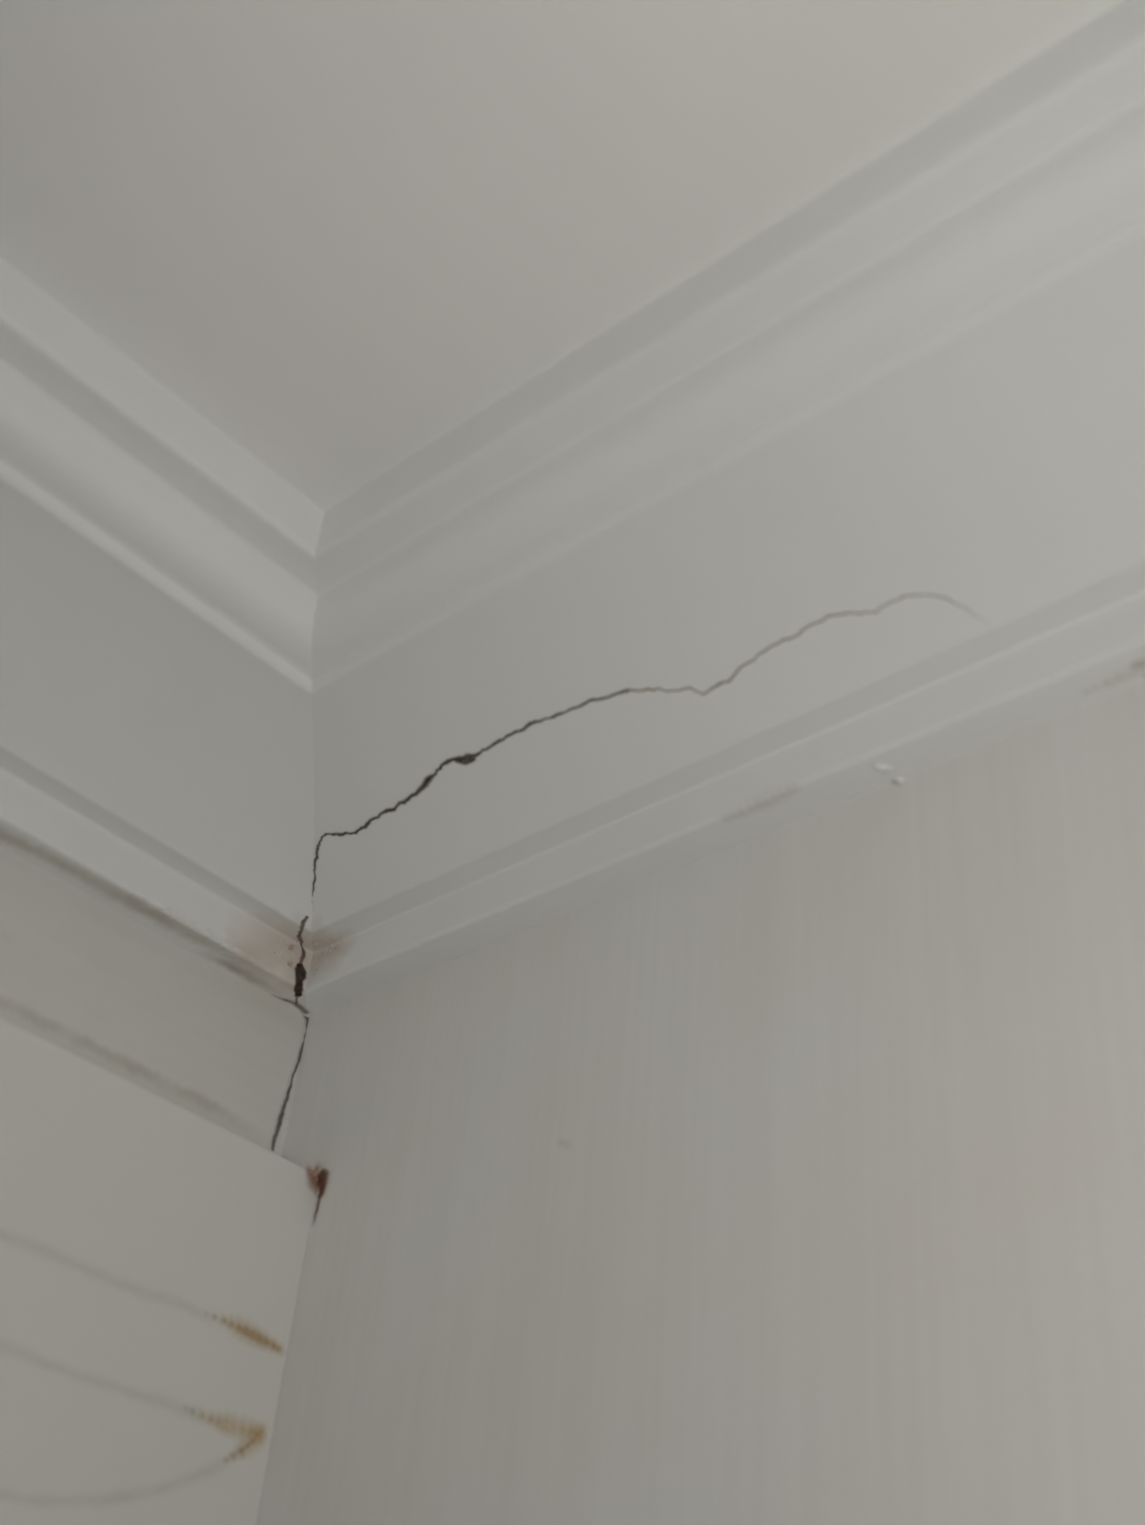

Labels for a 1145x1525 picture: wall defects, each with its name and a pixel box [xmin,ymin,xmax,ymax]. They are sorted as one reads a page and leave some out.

crack [312,594,952,896]
crack [272,998,309,1151]
rust [307,1168,327,1219]